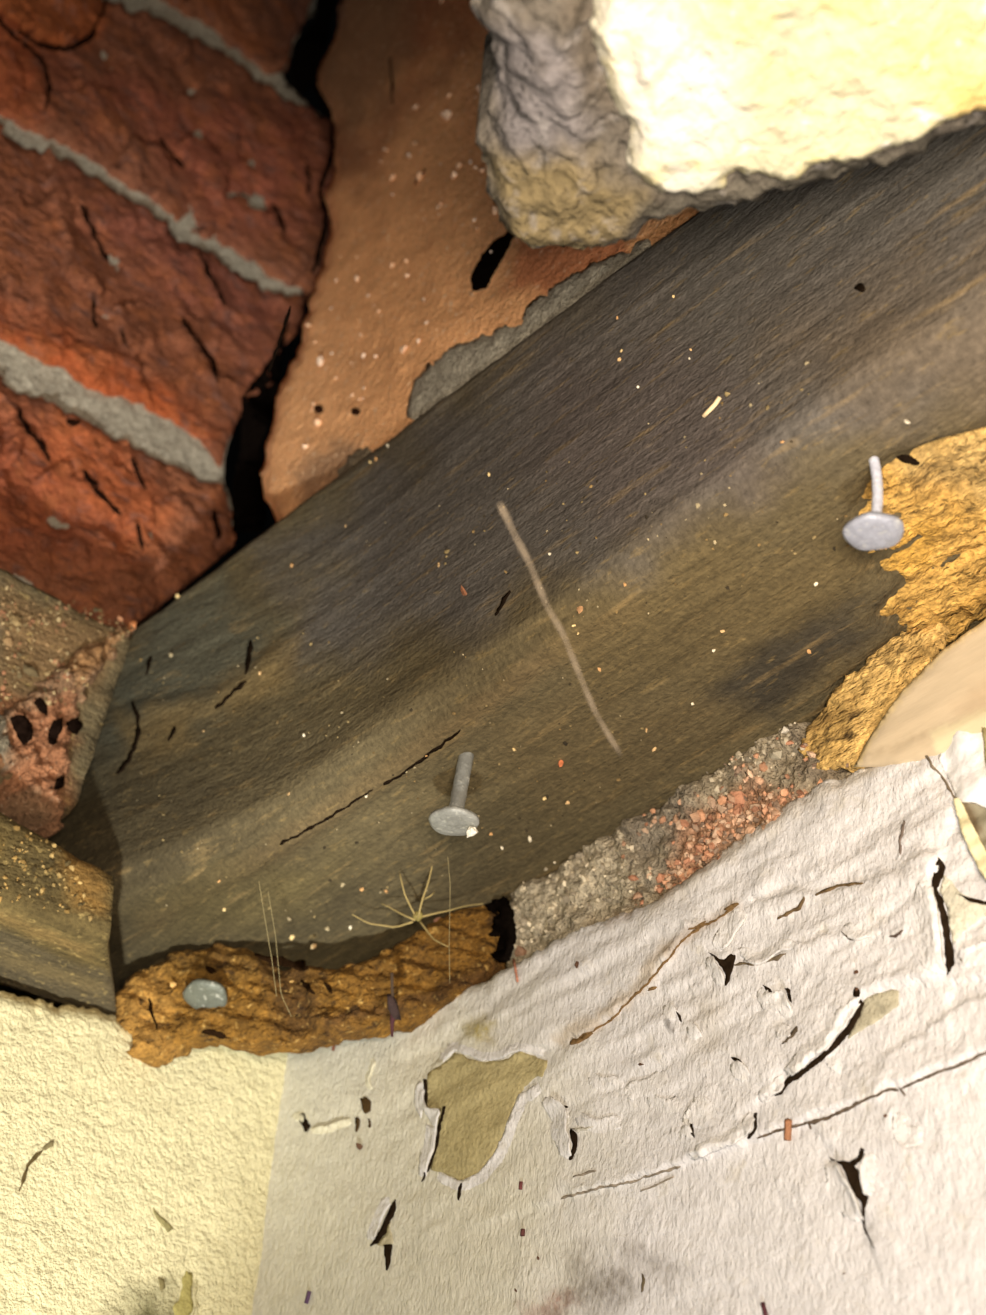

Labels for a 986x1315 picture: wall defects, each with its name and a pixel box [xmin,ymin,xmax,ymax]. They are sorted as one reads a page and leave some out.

crack [289,0,337,273]
crack [270,204,286,234]
crack [197,252,226,307]
crack [181,306,291,540]
spalling [506,722,852,969]
peeling [705,908,795,986]
peeling [414,1040,622,1200]
peeling [588,985,899,1160]
crack [757,1052,986,1139]
crack [561,1166,681,1199]
peeling [824,1148,883,1249]